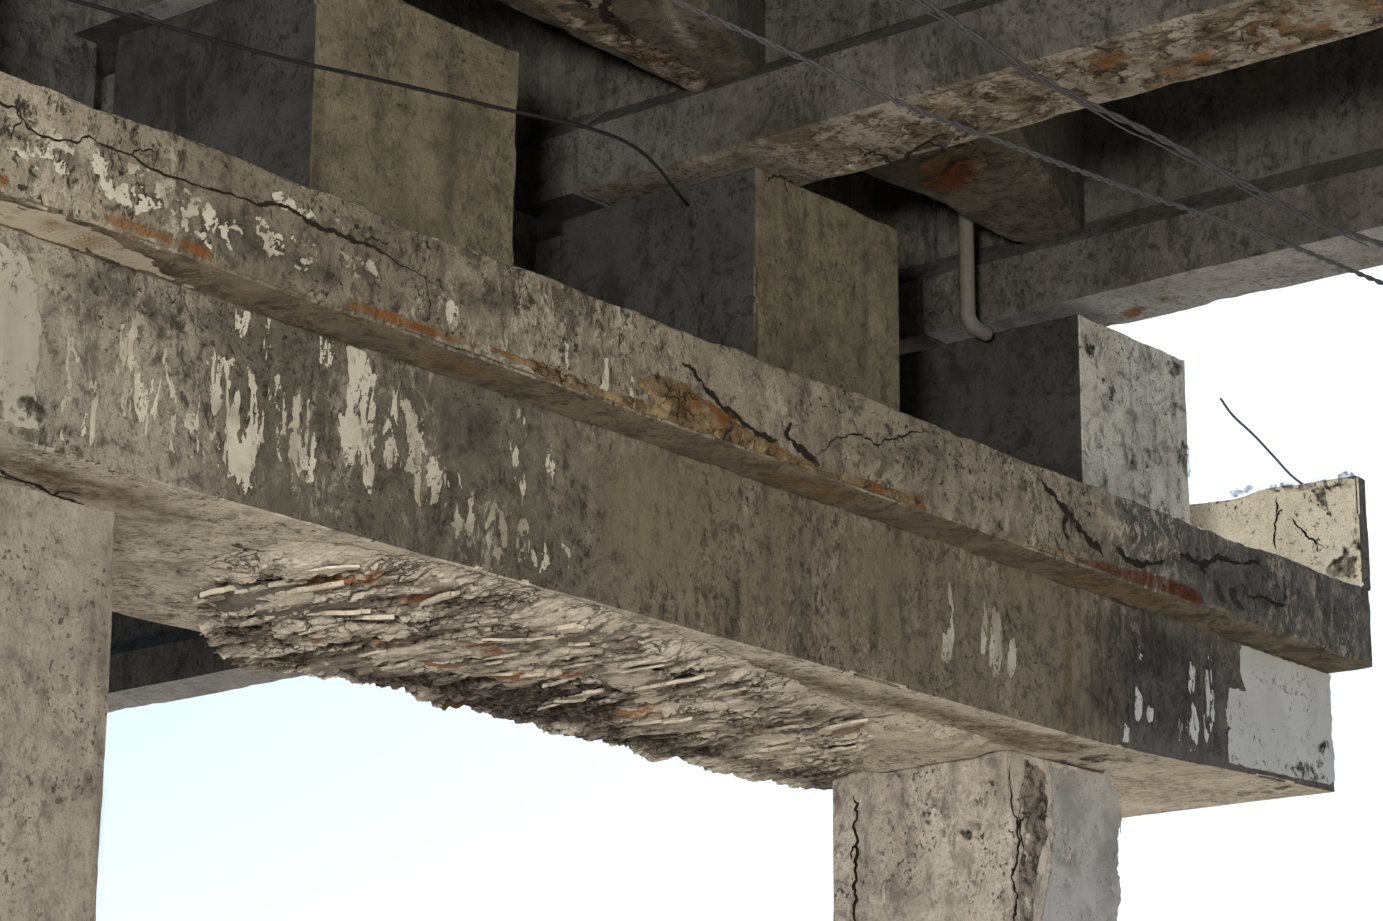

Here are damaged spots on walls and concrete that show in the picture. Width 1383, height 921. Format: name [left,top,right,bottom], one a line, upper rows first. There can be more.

peeling [0,201,195,289]
peeling [6,111,318,271]
crack [0,101,436,322]
peeling [0,242,42,430]
peeling [114,308,317,494]
crack [682,362,933,467]
spalling [192,336,875,790]
peeling [980,602,1017,678]
rust [1075,558,1203,604]
crack [1041,479,1326,610]
crack [850,796,859,921]
crack [1008,764,1024,921]